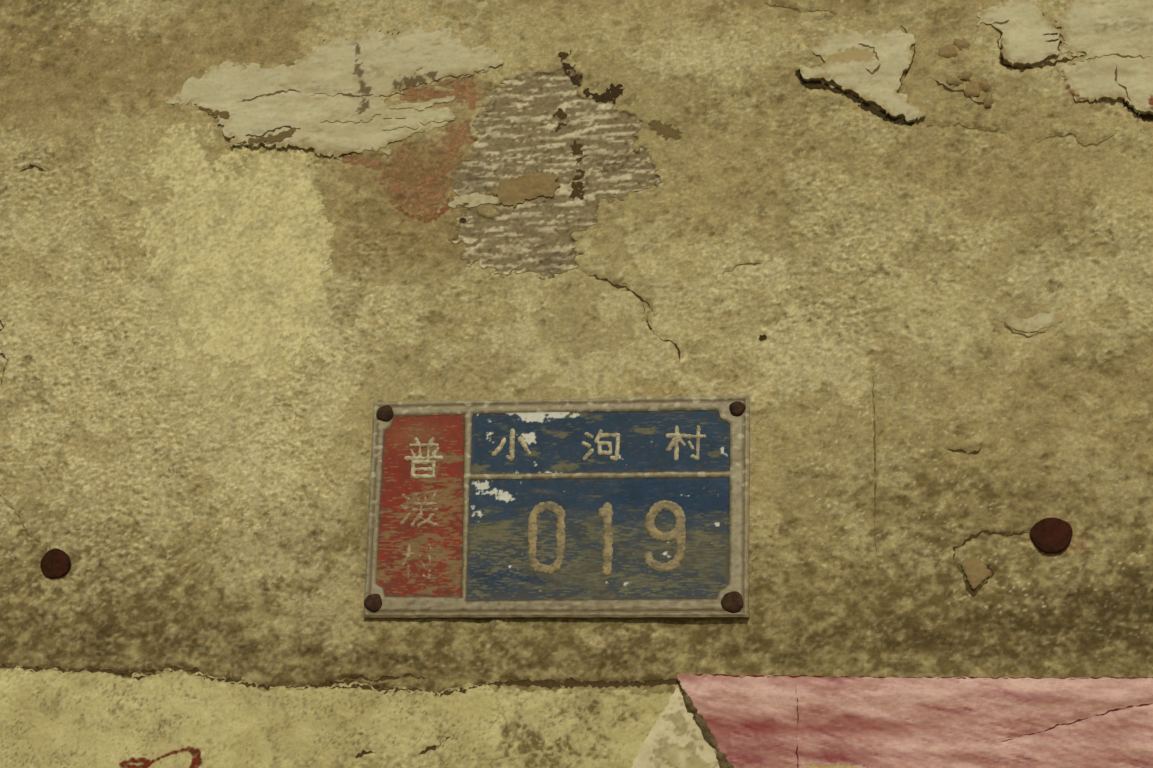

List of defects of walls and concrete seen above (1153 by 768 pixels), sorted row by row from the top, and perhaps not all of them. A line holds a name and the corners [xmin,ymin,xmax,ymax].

peeling [795,26,926,126]
flaking render [938,38,970,58]
flaking render [931,71,994,108]
peeling [977,0,1153,122]
crack [20,164,45,172]
flaking render [166,25,682,280]
crack [577,268,680,362]
crack [0,494,41,543]
crack [953,530,1030,596]